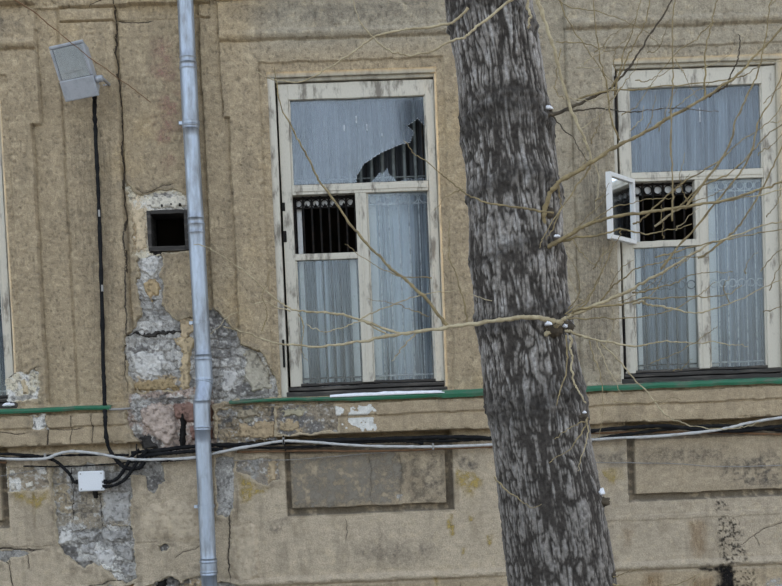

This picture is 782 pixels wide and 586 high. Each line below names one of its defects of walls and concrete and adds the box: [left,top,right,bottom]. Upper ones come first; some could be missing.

crack [89,0,174,392]
spalling [5,183,202,586]
spalling [209,308,377,448]
crack [0,547,41,586]
spalling [215,456,280,517]
leakage [700,501,754,586]